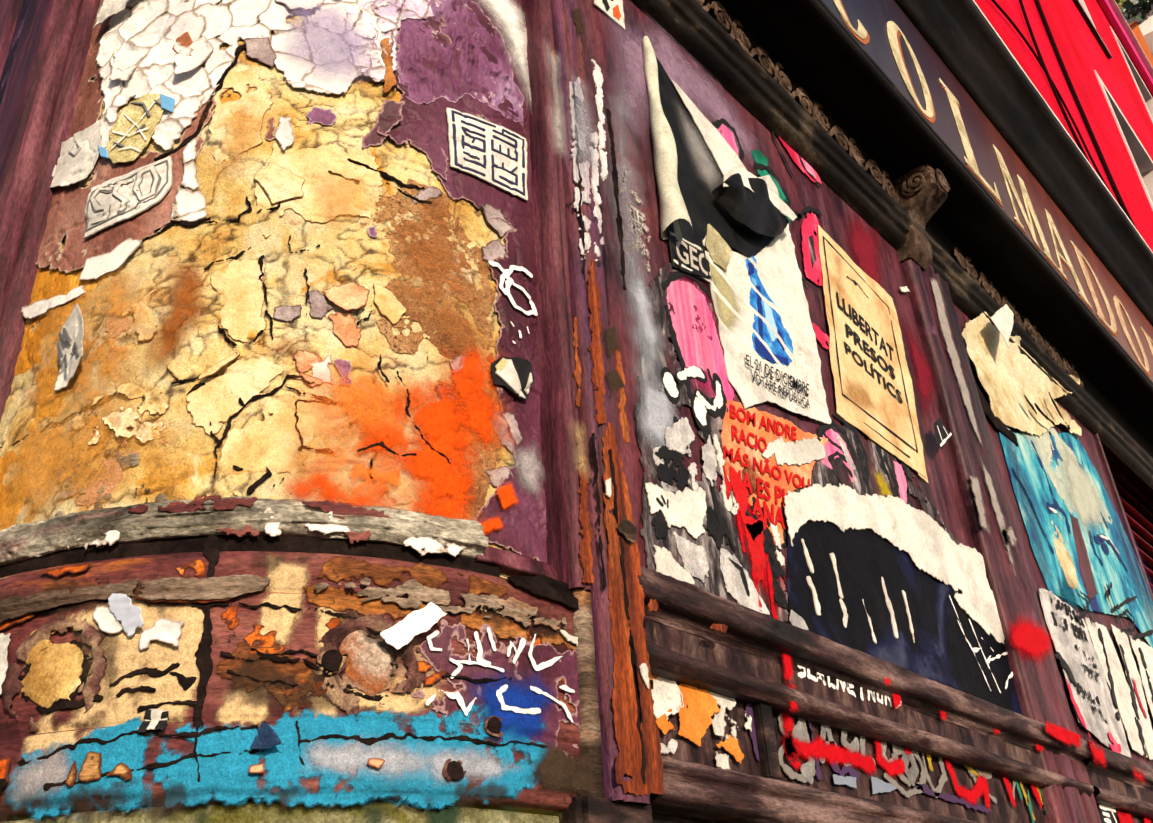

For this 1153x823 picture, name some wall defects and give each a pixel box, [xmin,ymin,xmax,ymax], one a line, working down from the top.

peeling [21,0,548,564]
crack [572,81,586,275]
crack [605,108,627,290]
peeling [92,606,123,634]
peeling [139,618,185,678]
peeling [216,606,328,713]
crack [0,534,579,791]
crack [210,354,451,495]
crack [591,433,646,784]
peeling [569,59,671,796]
peeling [702,423,733,512]
peeling [758,507,785,607]